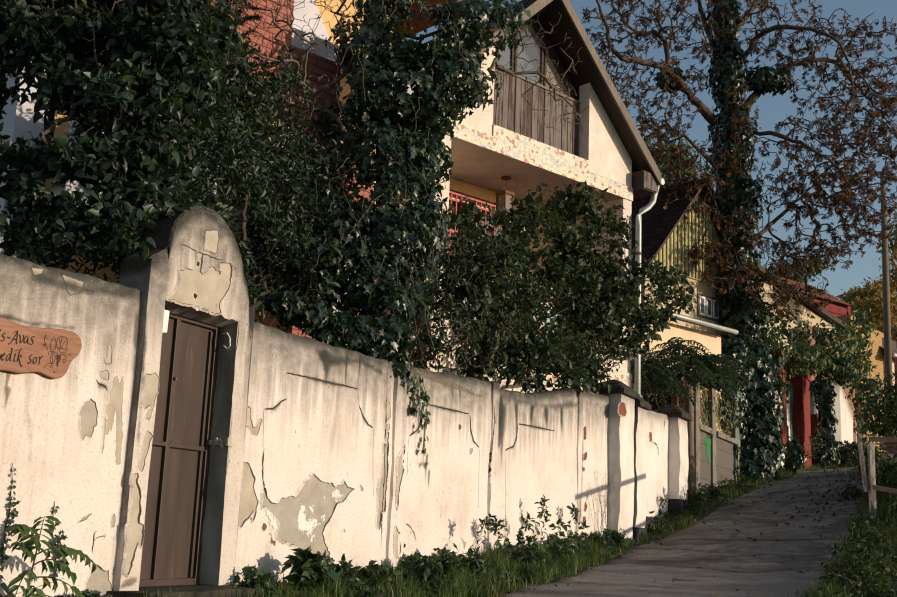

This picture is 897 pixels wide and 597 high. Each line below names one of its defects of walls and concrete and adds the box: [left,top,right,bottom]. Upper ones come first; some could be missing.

flaking render [168,229,233,316]
peeling [78,344,125,468]
flaking render [111,371,160,578]
flaking render [246,405,263,437]
flaking render [238,460,364,557]
damp [320,350,382,379]
flaking render [375,401,405,531]
flaking render [84,563,113,597]